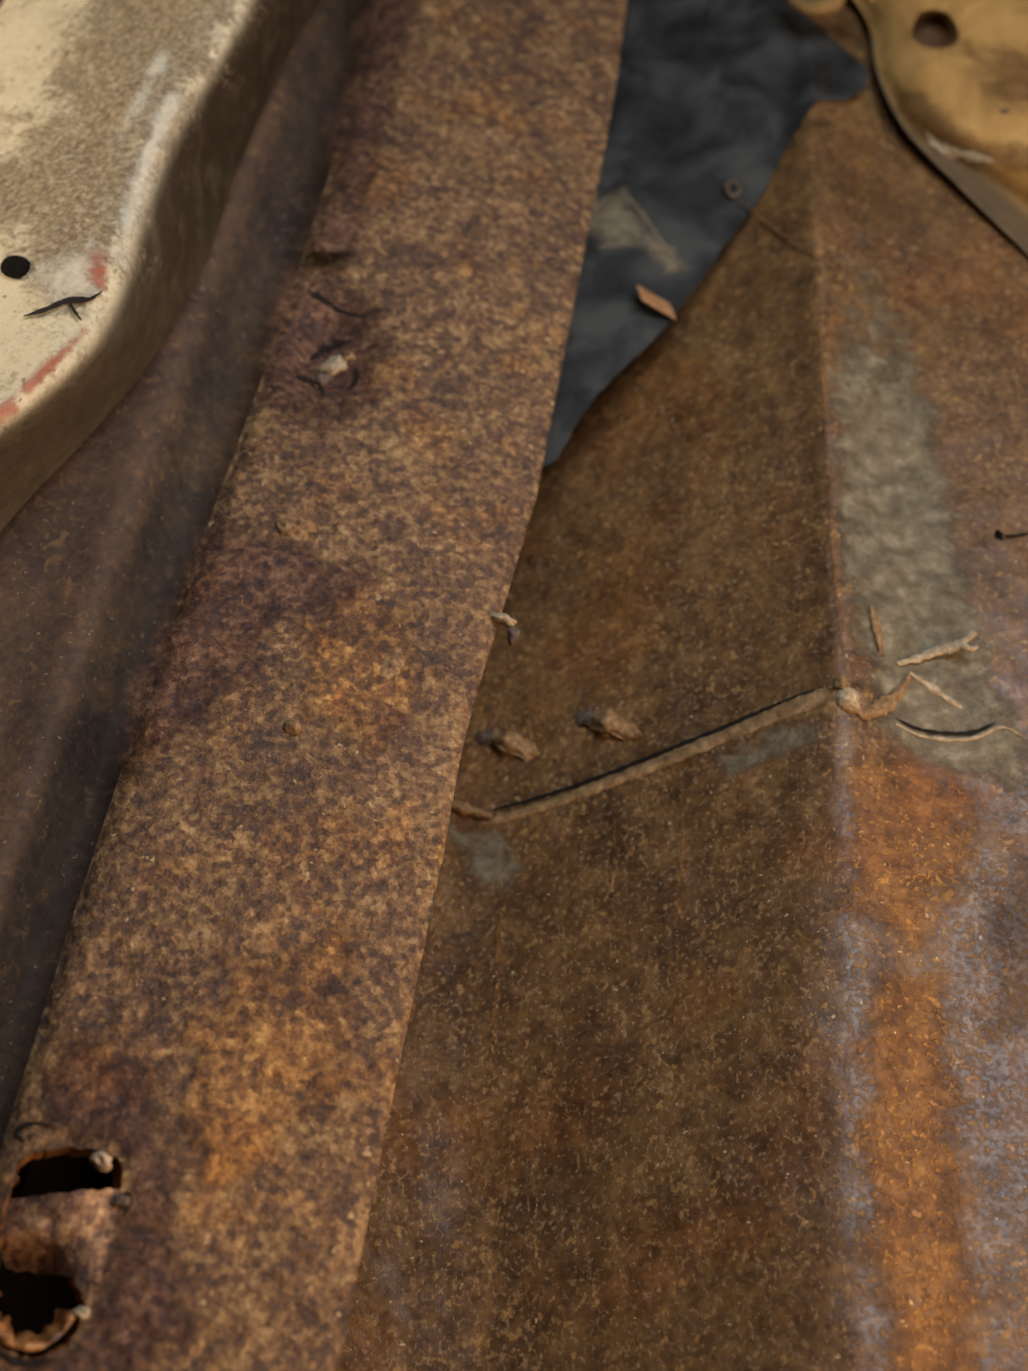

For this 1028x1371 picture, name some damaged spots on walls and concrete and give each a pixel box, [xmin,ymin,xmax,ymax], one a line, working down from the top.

corrosion [900,91,1028,169]
corrosion [0,0,627,1371]
corrosion [842,756,977,946]
corrosion [856,976,976,1371]